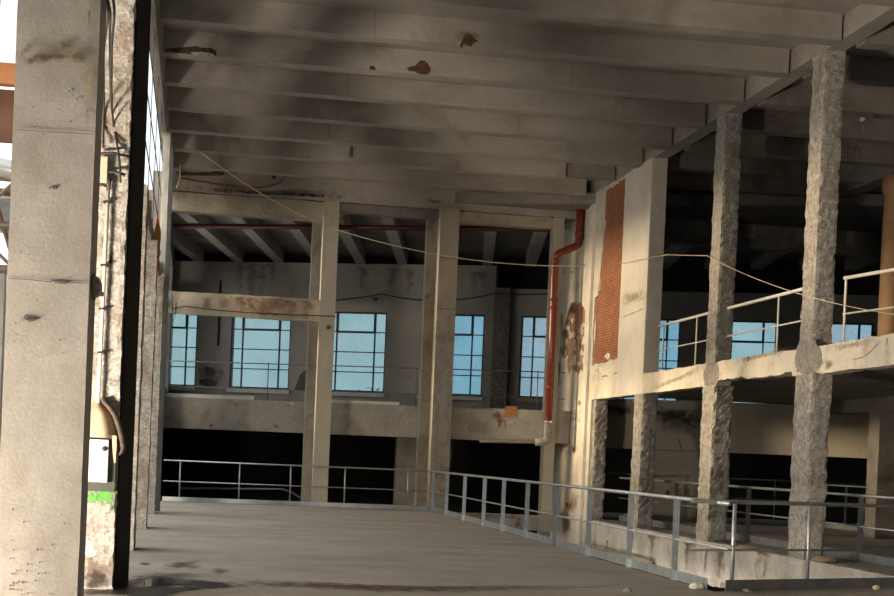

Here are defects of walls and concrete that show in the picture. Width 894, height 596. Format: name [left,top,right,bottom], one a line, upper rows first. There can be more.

damp [21,42,95,99]
spalling [165,46,217,56]
spalling [407,60,431,75]
flaking render [563,163,625,373]